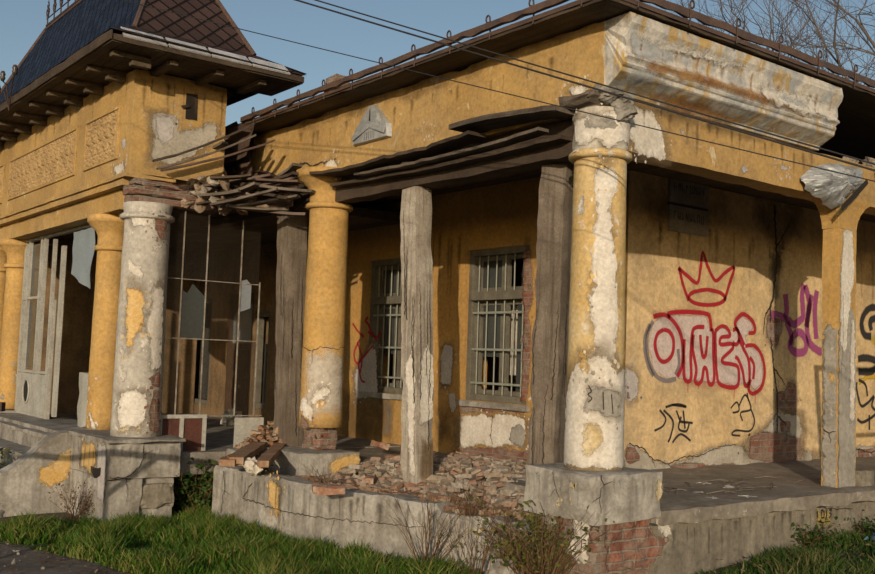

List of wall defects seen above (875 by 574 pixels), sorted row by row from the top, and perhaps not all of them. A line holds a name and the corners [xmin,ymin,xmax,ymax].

flaking render [149,93,224,166]
rust [654,95,734,123]
rust [648,63,774,103]
peeling [114,256,164,437]
peeling [437,247,535,461]
peeling [542,74,875,528]
crack [763,205,789,450]
peeling [299,375,332,438]
crack [110,445,153,500]
crack [220,471,422,528]
flaking render [565,520,590,565]
flaking render [604,517,672,572]